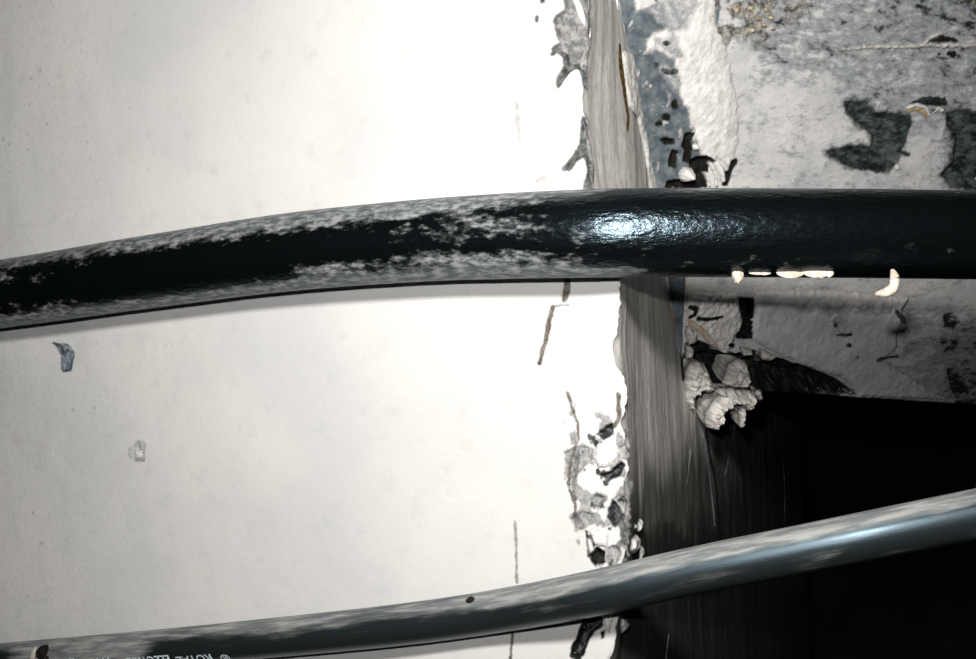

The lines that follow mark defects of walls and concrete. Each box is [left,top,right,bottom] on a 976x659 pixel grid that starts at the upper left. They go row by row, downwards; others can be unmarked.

spalling [551,0,591,87]
spalling [712,0,807,47]
spalling [562,115,594,189]
peeling [622,50,682,188]
peeling [825,98,911,173]
peeling [940,106,976,190]
spalling [564,392,645,566]